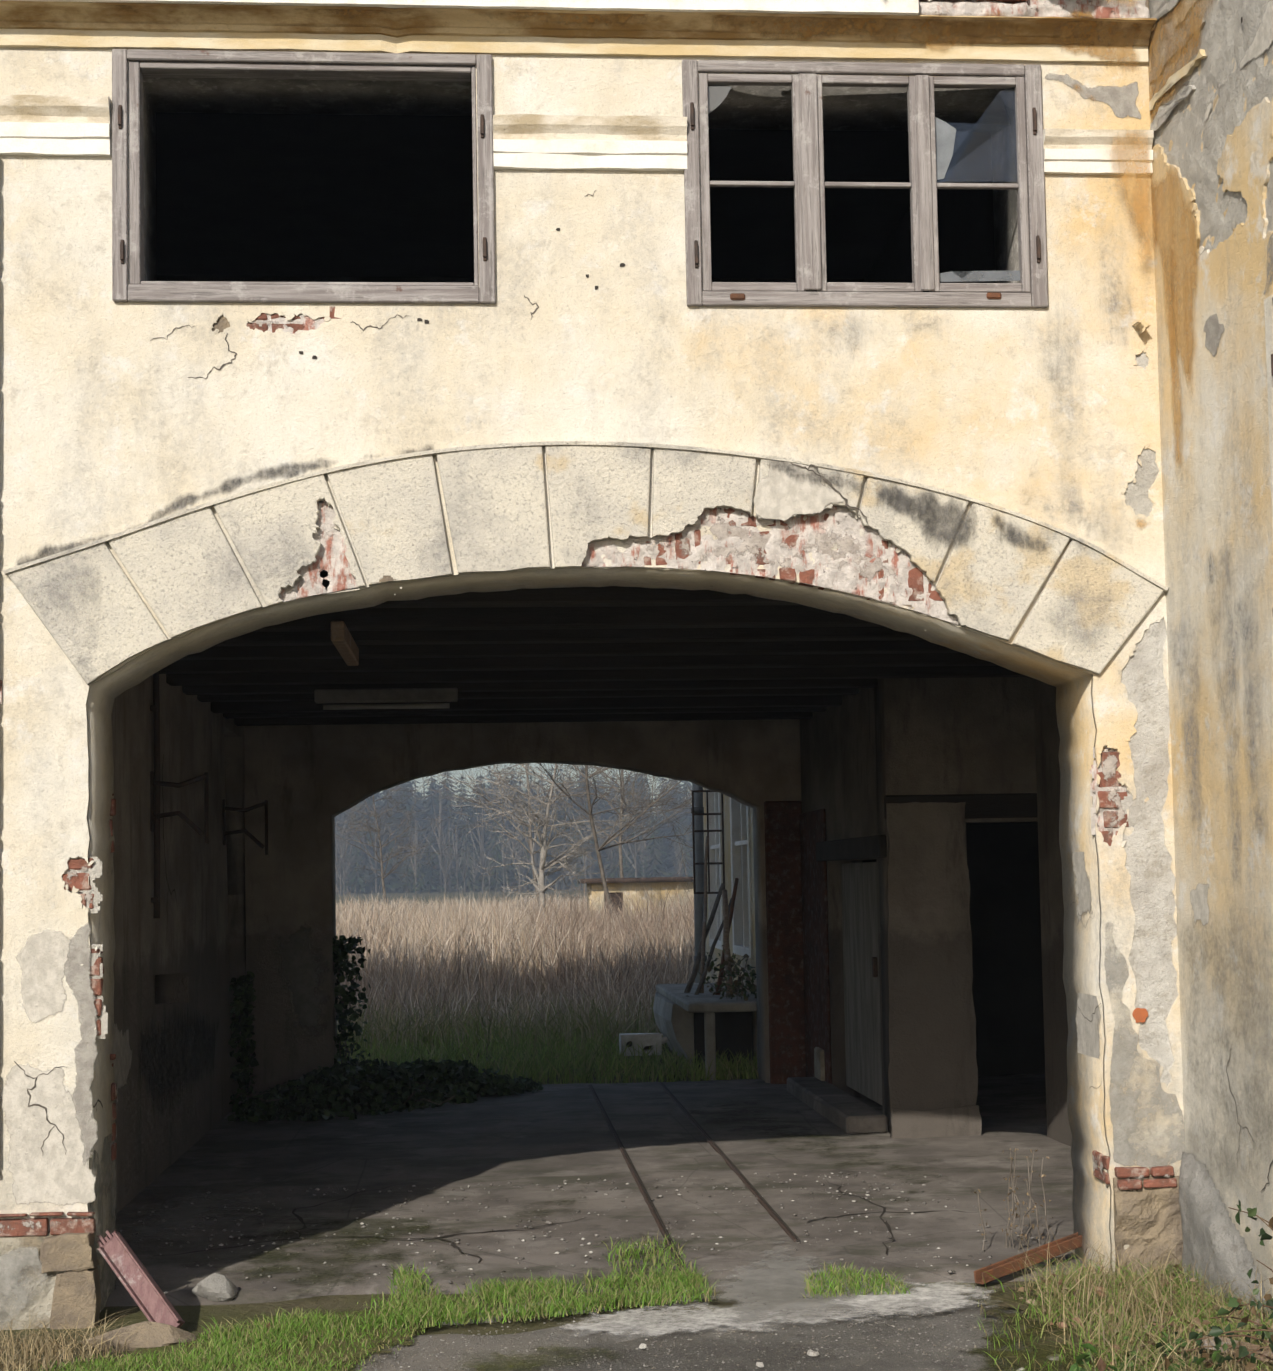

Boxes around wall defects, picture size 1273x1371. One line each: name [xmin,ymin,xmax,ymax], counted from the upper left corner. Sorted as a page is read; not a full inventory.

peeling [1045,0,1273,254]
crack [150,325,237,379]
spalling [212,306,342,359]
crack [352,314,407,331]
spalling [1121,443,1159,517]
spalling [279,500,358,602]
spalling [581,506,963,631]
spalling [1089,618,1209,1086]
crack [14,1061,67,1154]
peeling [0,794,133,1330]
peeling [1075,993,1101,1059]
crack [1226,1042,1273,1191]